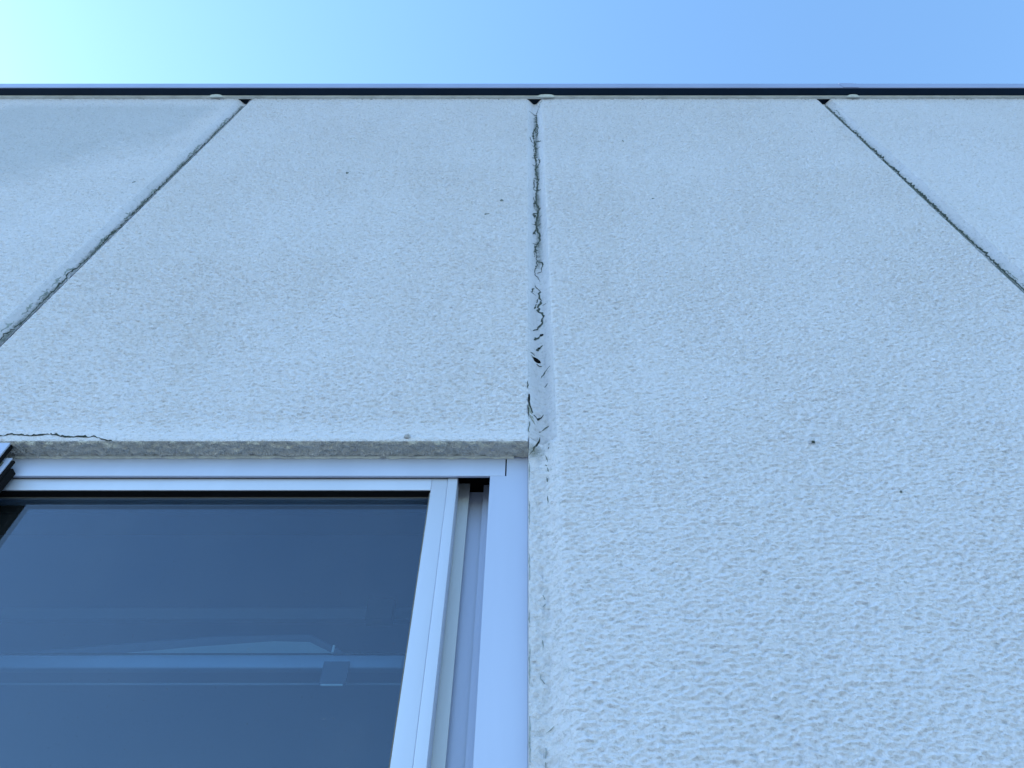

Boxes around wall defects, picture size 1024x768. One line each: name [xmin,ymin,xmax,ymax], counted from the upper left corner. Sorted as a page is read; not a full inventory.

crack [527,101,550,525]
crack [0,433,112,441]
crack [528,555,545,684]
crack [528,716,554,765]